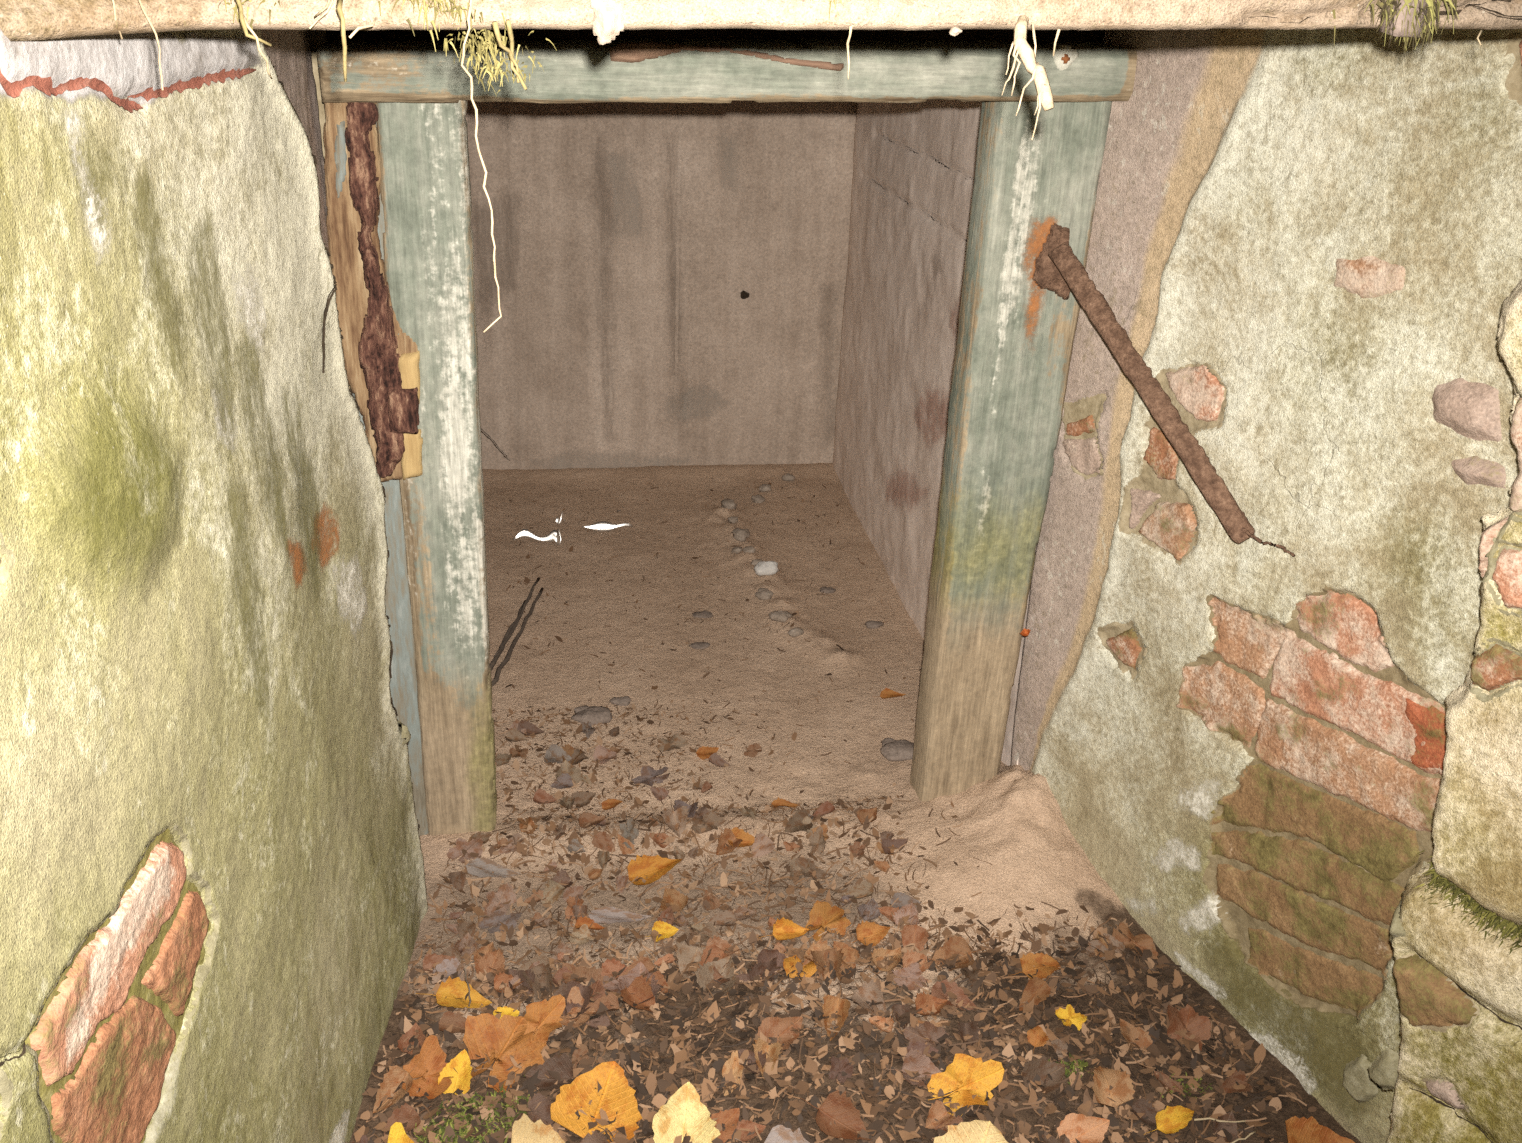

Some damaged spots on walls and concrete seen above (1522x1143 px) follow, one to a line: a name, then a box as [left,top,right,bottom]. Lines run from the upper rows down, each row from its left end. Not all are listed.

spalling [1504,32,1522,105]
flaking render [1334,256,1406,298]
rust [1024,219,1295,557]
spalling [1155,363,1227,436]
spalling [1118,414,1199,566]
flaking render [1432,378,1522,617]
spalling [1469,638,1522,702]
spalling [1176,585,1480,1033]
spalling [24,824,220,1143]